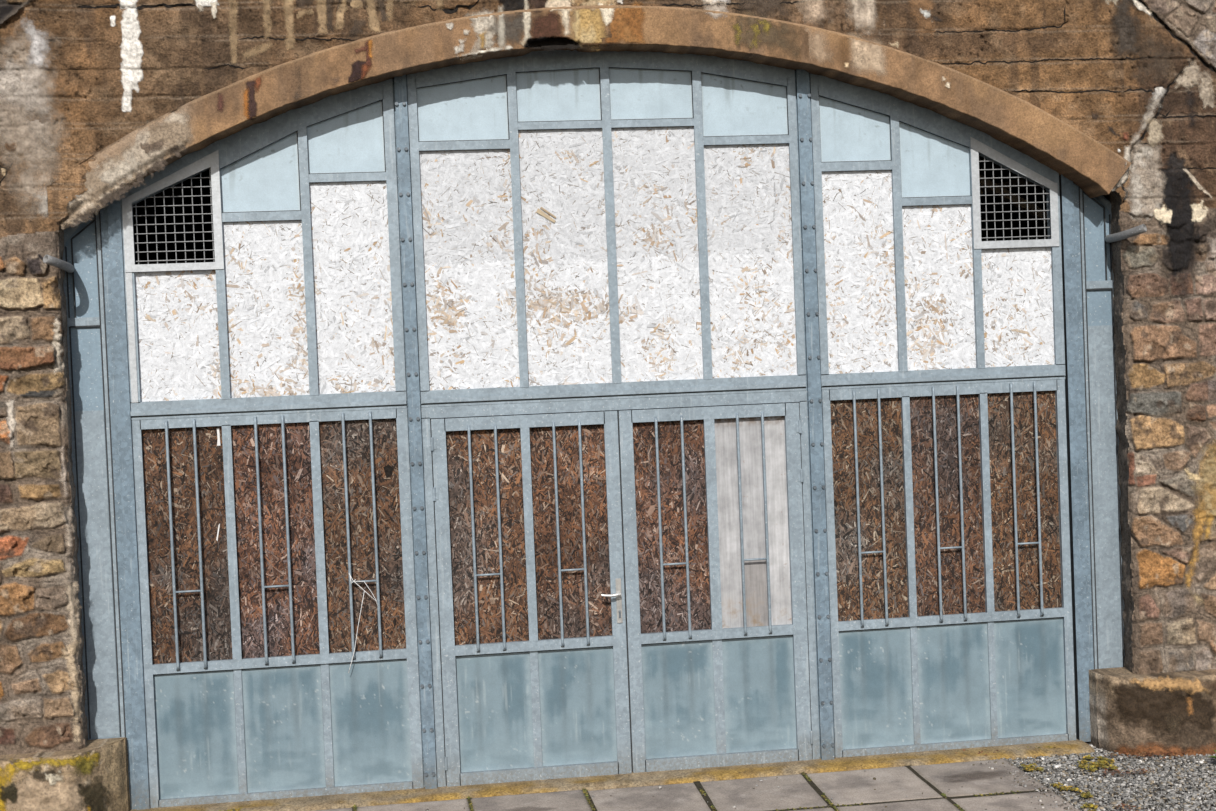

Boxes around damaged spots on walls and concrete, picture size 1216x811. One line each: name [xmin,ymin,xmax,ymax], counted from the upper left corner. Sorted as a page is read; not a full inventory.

damp [0,26,54,194]
spalling [37,194,48,214]
spalling [58,112,191,231]
damp [110,0,143,112]
rust [244,78,261,120]
rust [349,40,372,82]
crack [936,0,1216,202]
damp [1114,0,1216,295]
damp [1114,681,1216,733]